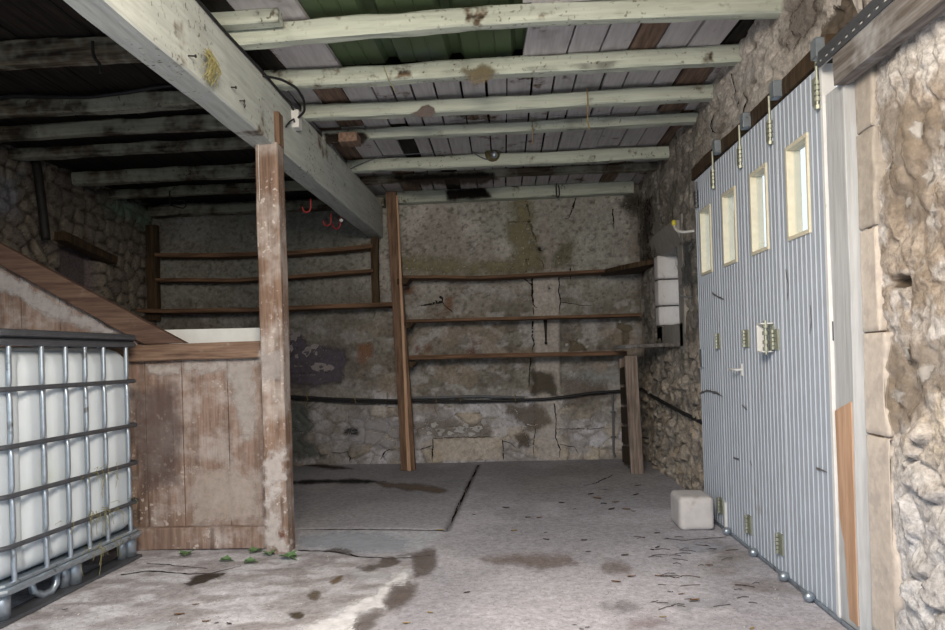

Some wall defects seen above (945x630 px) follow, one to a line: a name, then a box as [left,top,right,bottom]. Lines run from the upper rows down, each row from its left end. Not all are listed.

crack [421,296,452,312]
crack [509,205,590,385]
water stain [289,331,347,387]
crack [420,404,603,460]
water stain [506,371,606,448]
water stain [302,549,435,630]